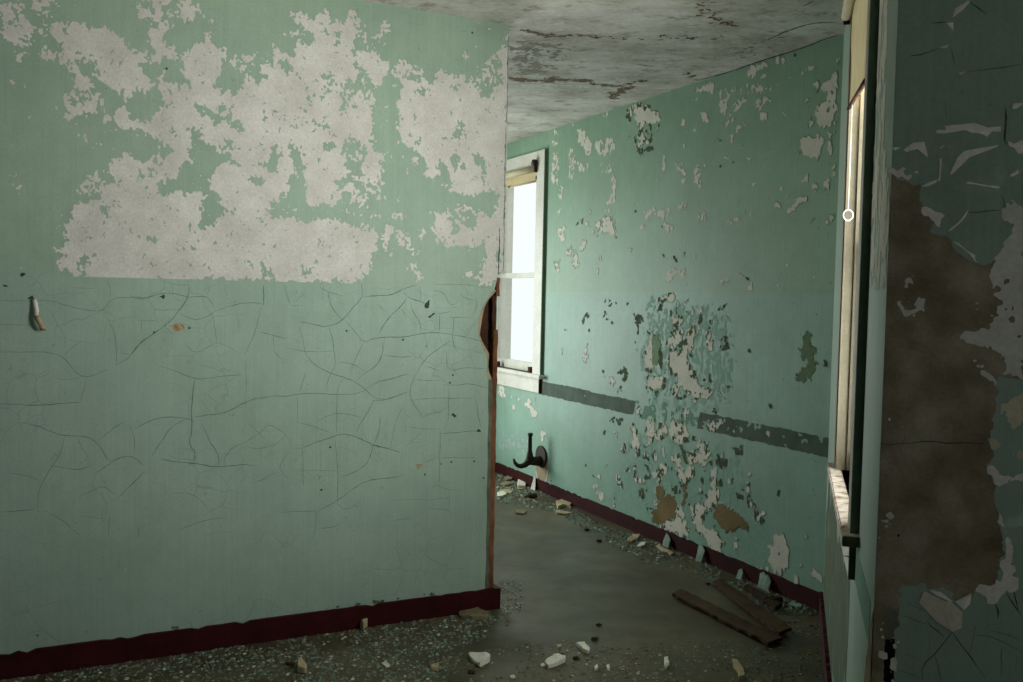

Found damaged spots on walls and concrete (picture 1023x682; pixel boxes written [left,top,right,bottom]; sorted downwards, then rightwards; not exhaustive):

crack [2,35,509,539]
peeling [0,0,617,418]
damp [509,38,576,77]
peeling [626,102,706,188]
peeling [696,54,796,143]
peeling [774,56,840,215]
flaking render [864,0,1023,682]
peeling [592,252,823,591]
crack [899,592,1023,680]